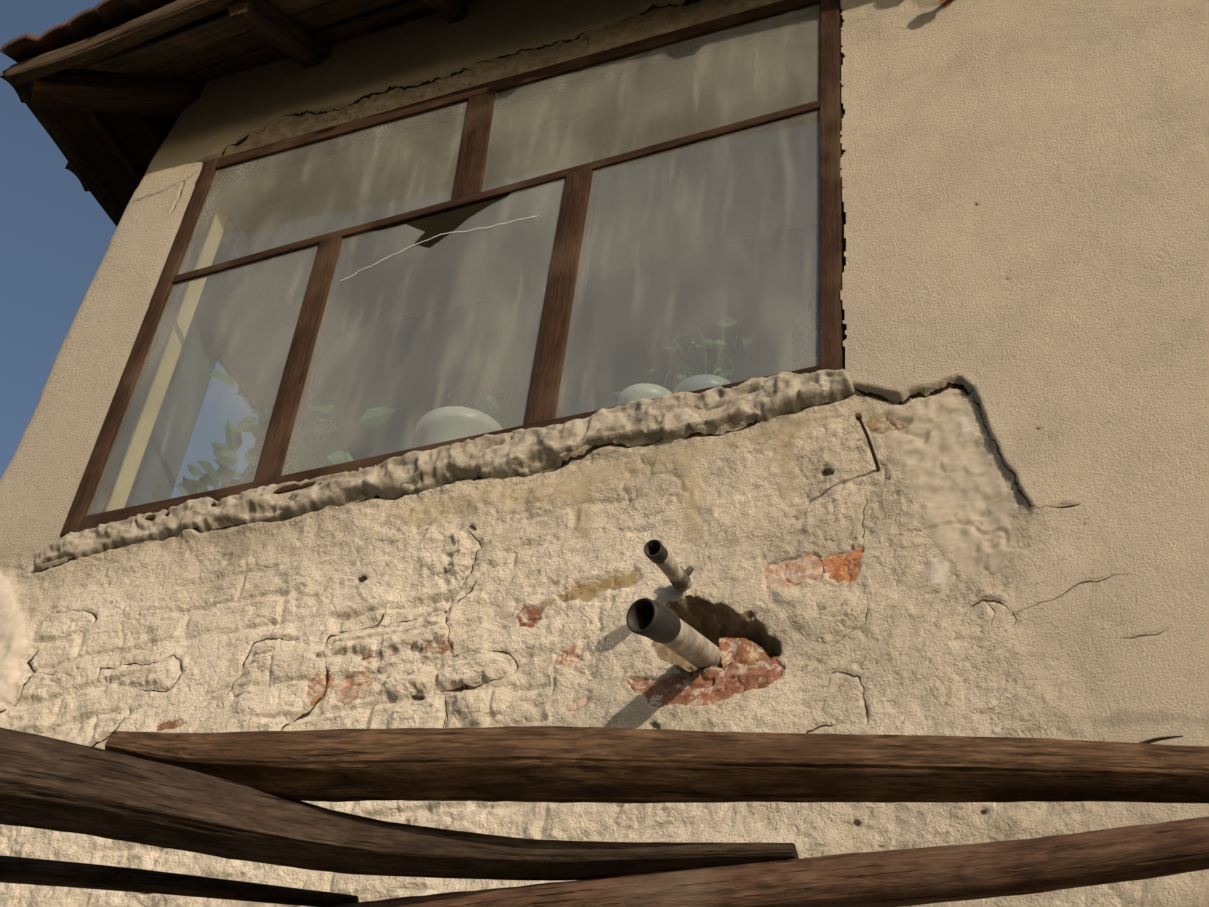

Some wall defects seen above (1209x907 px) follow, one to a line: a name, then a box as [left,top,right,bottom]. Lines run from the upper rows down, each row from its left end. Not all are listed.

crack [538,421,757,474]
spalling [866,416,909,433]
crack [786,309,1081,509]
flaking render [764,548,864,593]
peeling [0,571,27,705]
flaking render [307,649,397,706]
flaking render [420,634,452,655]
flaking render [516,606,543,628]
flaking render [555,645,583,668]
spalling [627,595,785,729]
crack [965,574,1128,627]
flaking render [156,719,186,731]